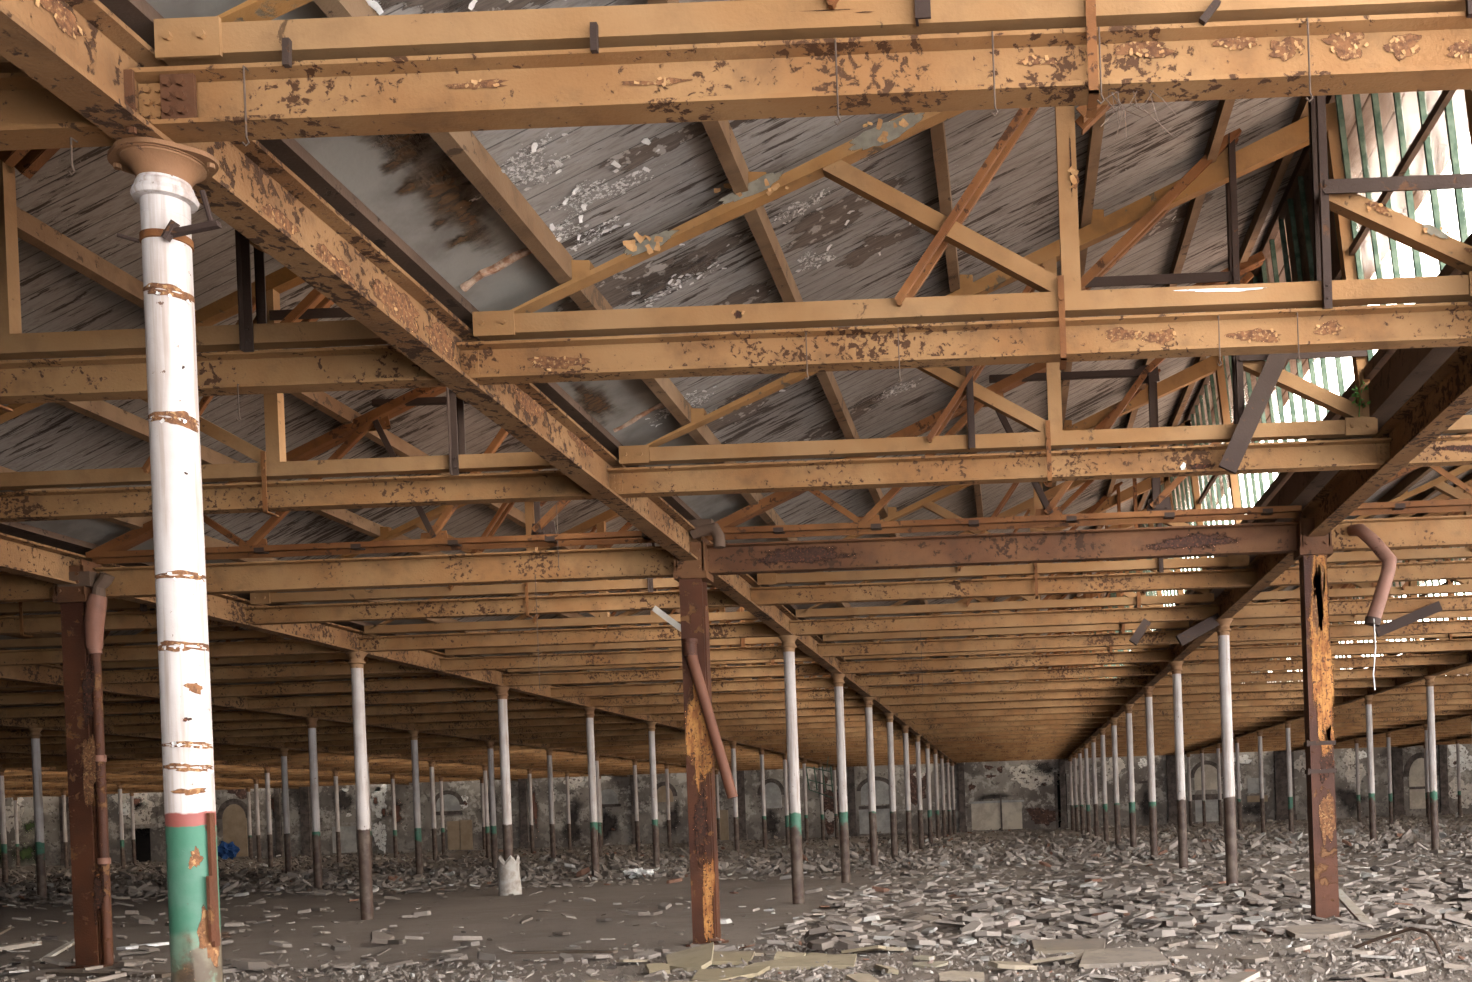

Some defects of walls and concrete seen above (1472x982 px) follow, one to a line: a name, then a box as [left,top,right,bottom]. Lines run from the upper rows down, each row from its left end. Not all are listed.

peeling [366,0,550,15]
damp [365,133,491,248]
peeling [501,132,576,191]
peeling [545,121,753,308]
peeling [556,299,582,312]
corrosion [81,657,97,807]
corrosion [1308,555,1336,849]
corrosion [685,683,715,943]
corrosion [92,867,106,925]
corrosion [197,905,219,968]